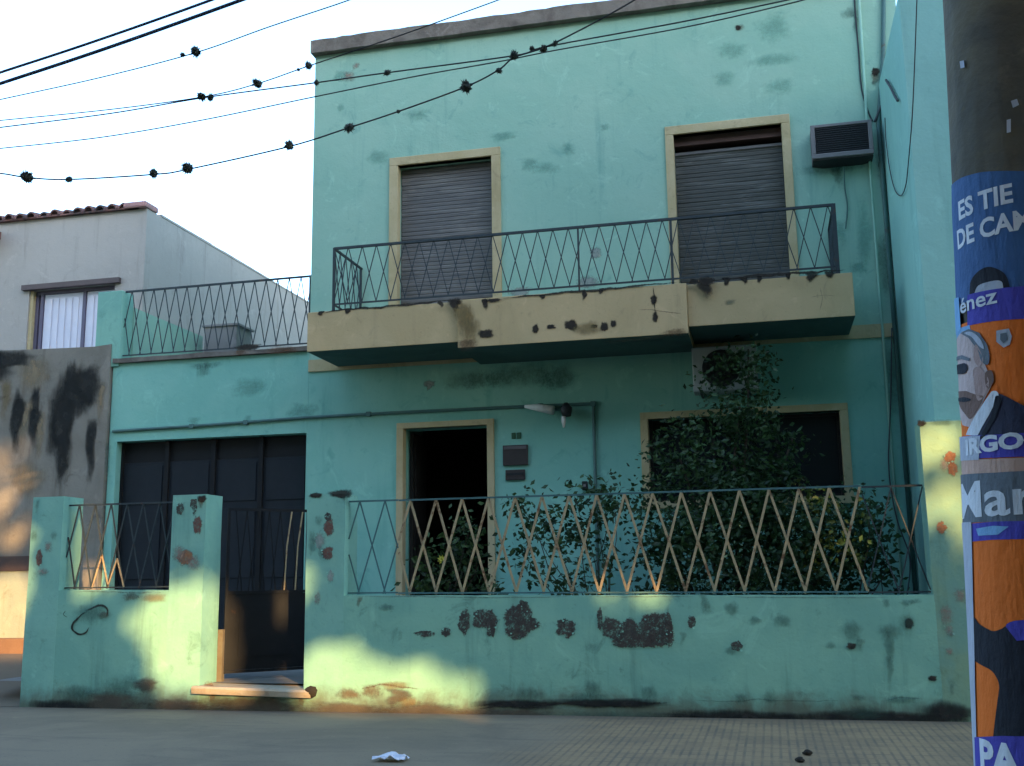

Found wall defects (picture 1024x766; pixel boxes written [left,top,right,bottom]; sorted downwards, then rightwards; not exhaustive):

spalling [532,320,616,333]
damp [0,351,105,476]
peeling [414,600,540,640]
peeling [555,618,576,638]
peeling [597,608,675,648]
rust [343,683,414,704]